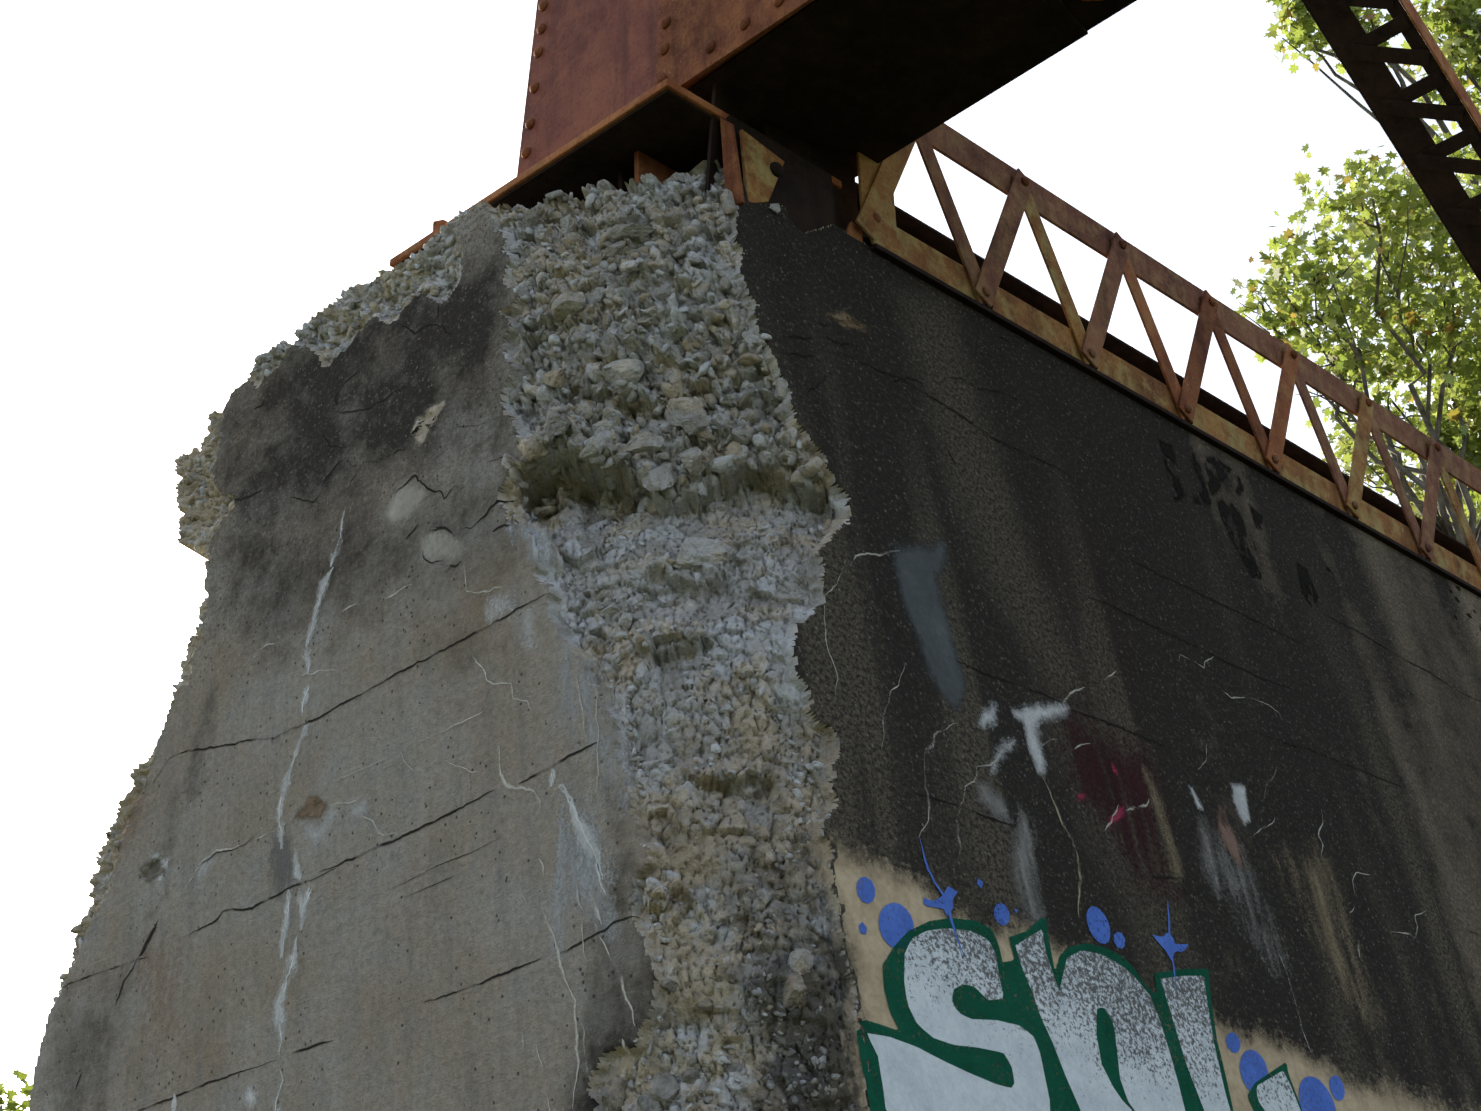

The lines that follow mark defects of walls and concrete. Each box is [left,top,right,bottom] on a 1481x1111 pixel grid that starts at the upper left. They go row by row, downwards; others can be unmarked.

spalling [175,401,235,570]
spalling [167,591,208,714]
crack [343,584,412,611]
crack [464,568,502,594]
spalling [246,160,870,1111]
spalling [51,735,161,1009]
crack [116,817,276,1002]
leakage [275,555,335,1111]
crack [323,651,635,1111]